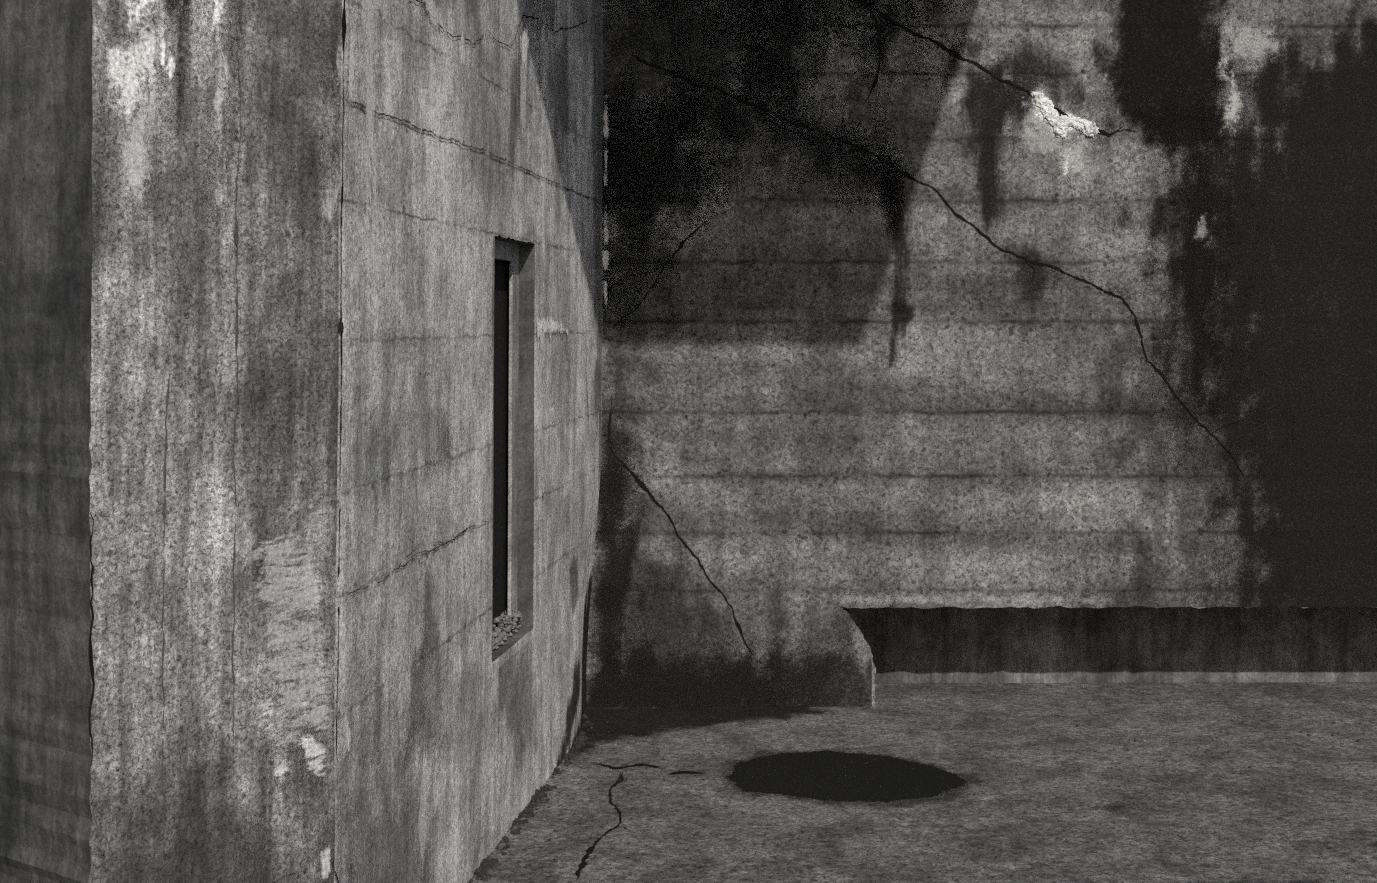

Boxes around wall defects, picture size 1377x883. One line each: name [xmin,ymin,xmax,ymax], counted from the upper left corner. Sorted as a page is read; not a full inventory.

damp [107,0,183,123]
damp [202,0,224,40]
crack [340,0,598,474]
damp [602,0,939,366]
crack [631,54,1246,477]
crack [858,0,1136,137]
damp [949,44,1083,230]
spalling [1031,91,1100,138]
damp [1093,0,1377,607]
crack [336,502,493,783]
crack [608,402,753,655]
crack [576,762,706,881]